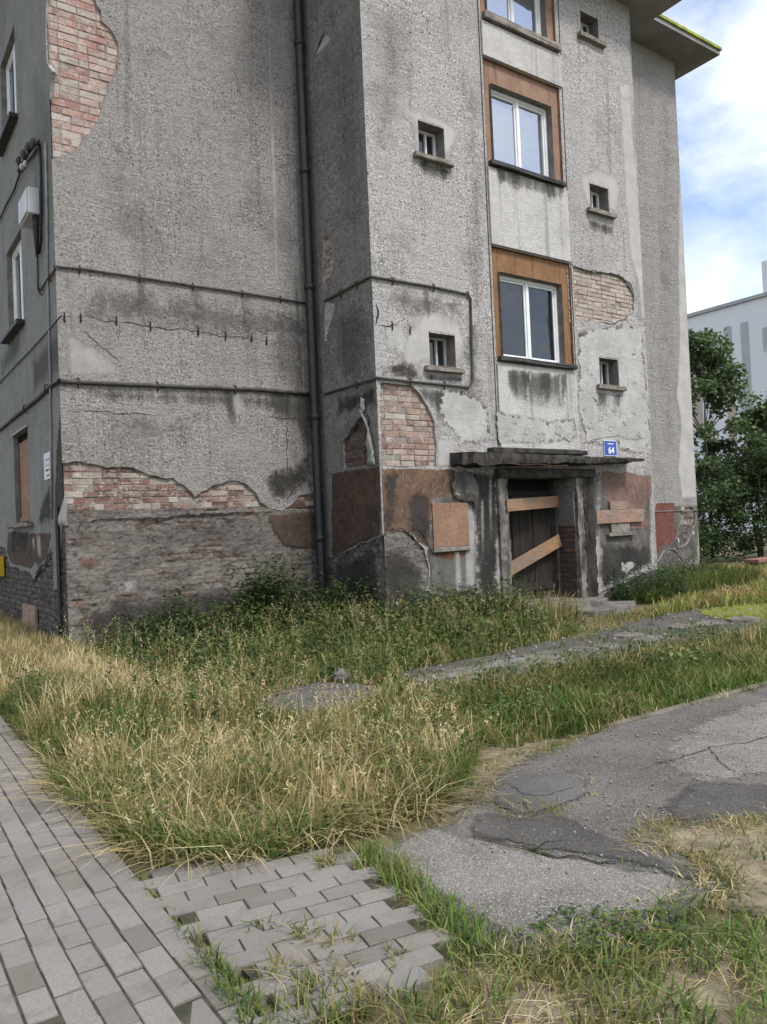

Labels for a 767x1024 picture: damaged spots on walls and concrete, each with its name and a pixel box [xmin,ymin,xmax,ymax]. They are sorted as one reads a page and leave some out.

flaking render [45,0,119,159]
crack [76,316,264,360]
water stain [509,370,566,404]
flaking render [328,263,651,593]
water stain [268,459,309,498]
water stain [11,531,41,555]
flaking render [7,461,316,591]
crack [657,736,767,771]
crack [472,834,617,864]